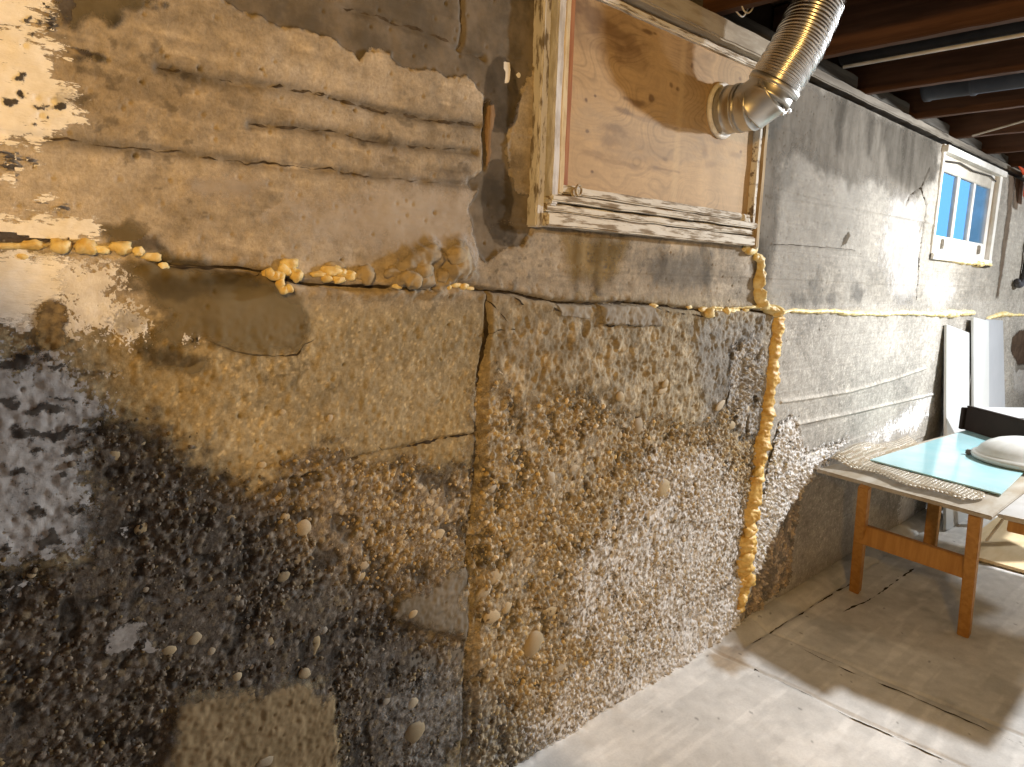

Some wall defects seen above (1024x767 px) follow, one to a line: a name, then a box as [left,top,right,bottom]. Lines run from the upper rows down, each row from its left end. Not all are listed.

peeling [0,0,94,188]
crack [48,137,473,188]
crack [157,67,474,149]
water stain [225,0,535,262]
water stain [99,221,146,242]
water stain [123,251,309,352]
peeling [0,192,155,598]
crack [160,261,715,767]
crack [753,569,914,643]